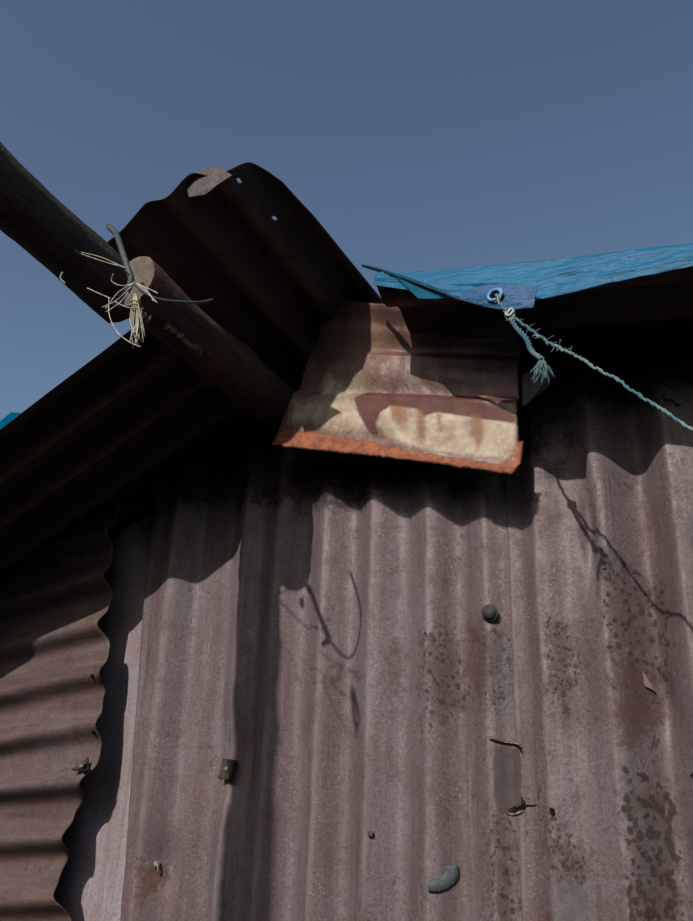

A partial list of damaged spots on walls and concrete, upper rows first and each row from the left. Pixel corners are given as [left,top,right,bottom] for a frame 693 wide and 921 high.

rust [273,320,523,473]
rust [621,766,684,921]